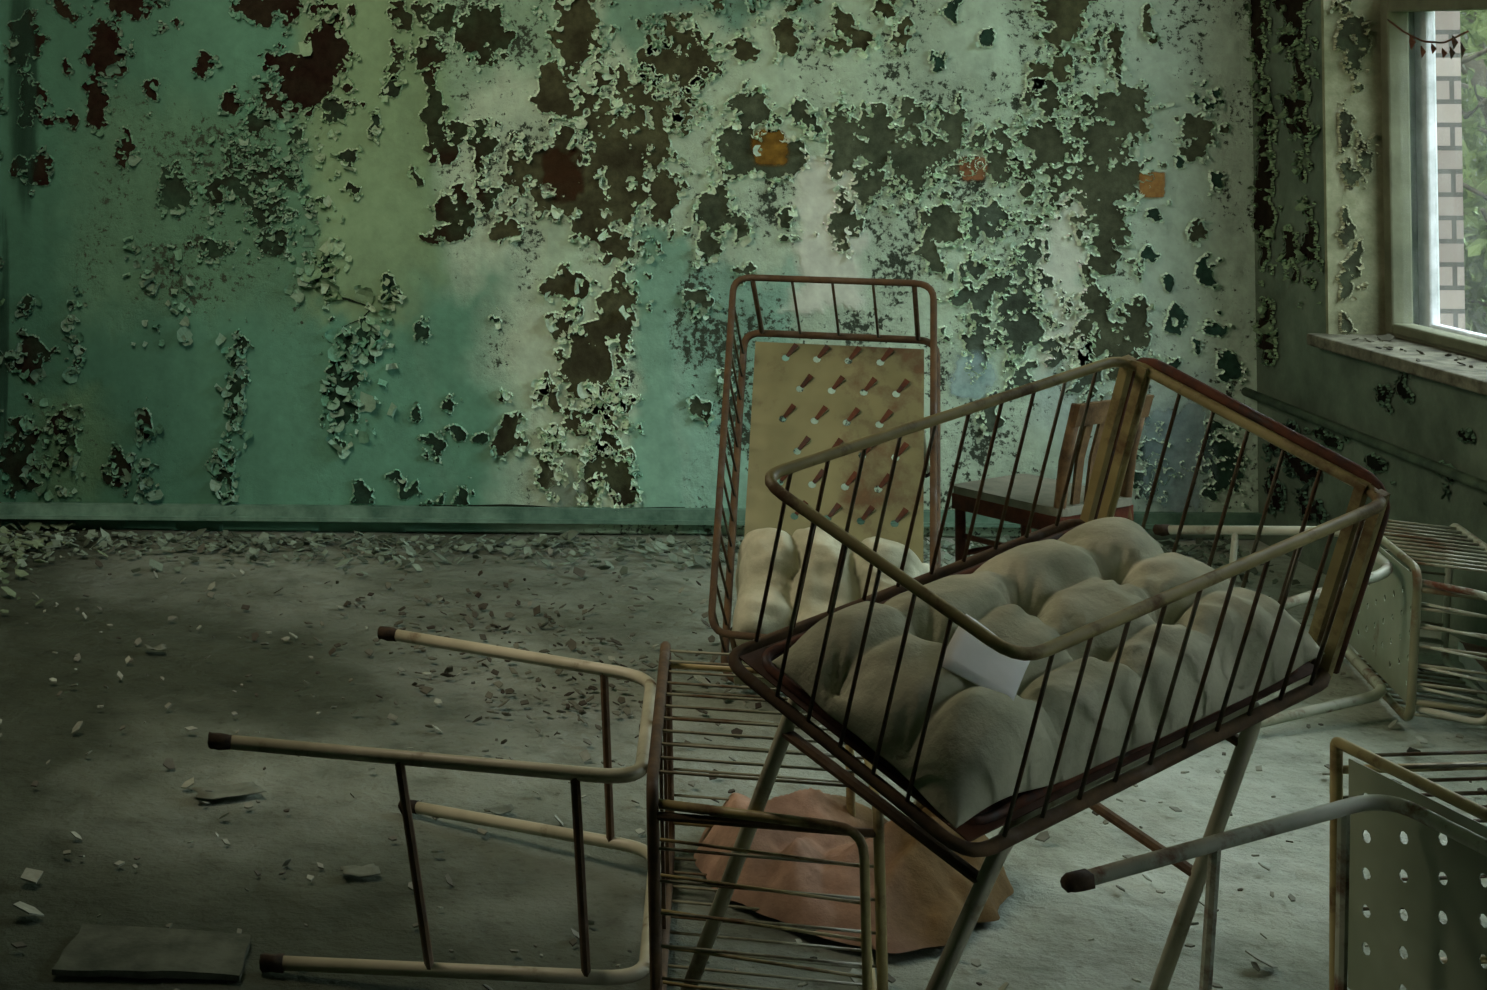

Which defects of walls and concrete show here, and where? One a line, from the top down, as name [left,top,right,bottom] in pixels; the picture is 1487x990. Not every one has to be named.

corrosion [751,129,789,166]
corrosion [1139,172,1165,198]
peeling [0,0,1382,525]
peeling [1372,372,1415,415]
peeling [1456,427,1476,445]
peeling [1363,452,1396,486]